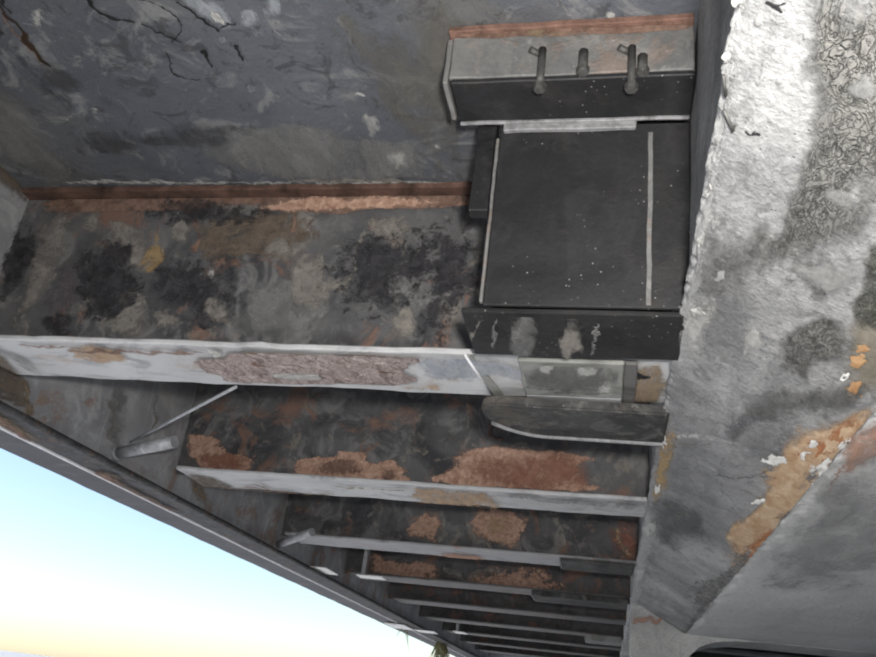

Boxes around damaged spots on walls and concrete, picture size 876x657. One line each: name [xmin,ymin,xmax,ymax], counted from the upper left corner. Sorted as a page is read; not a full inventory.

crack [0,0,52,67]
crack [87,0,244,81]
leakage [683,0,876,353]
rust [41,195,470,261]
peeling [194,350,420,386]
leakage [512,317,533,355]
leakage [559,324,600,359]
leakage [783,319,842,376]
rust [187,424,637,549]
spalling [682,410,870,634]
rust [370,554,569,591]